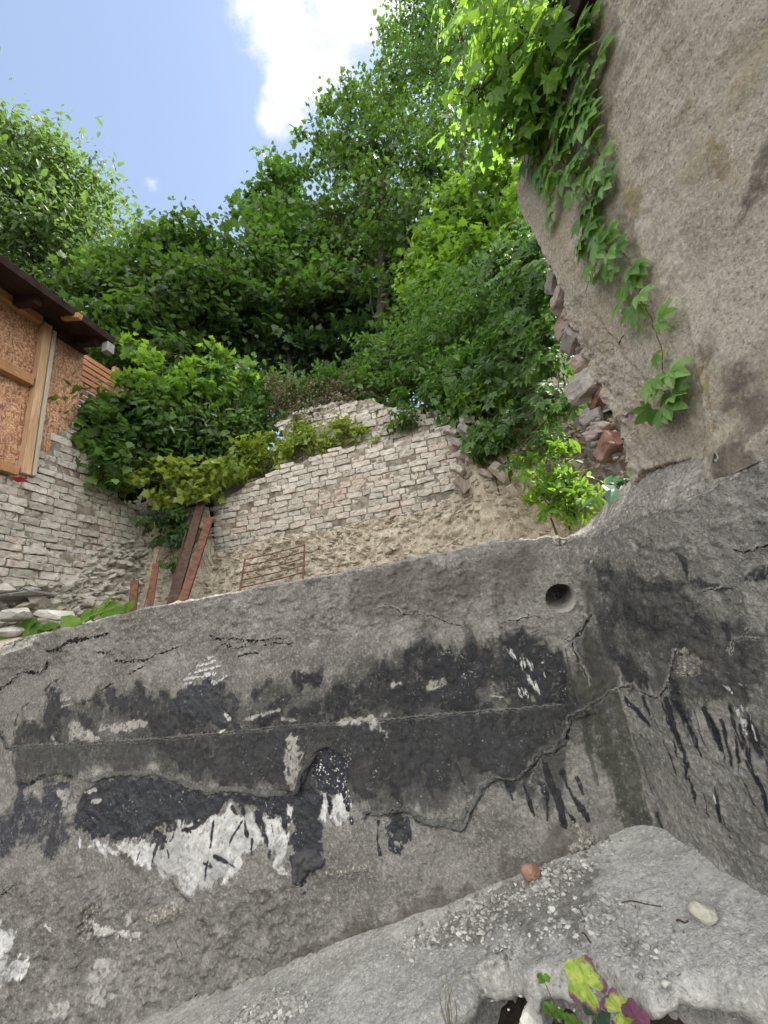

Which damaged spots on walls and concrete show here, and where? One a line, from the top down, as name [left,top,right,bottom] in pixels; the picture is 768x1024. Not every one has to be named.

peeling [182,656,227,686]
damp [259,670,322,727]
crack [0,611,682,832]
peeling [337,713,388,738]
peeling [426,678,447,691]
damp [554,626,768,838]
peeling [57,790,76,813]
peeling [69,709,316,943]
damp [108,805,289,881]
peeling [320,793,352,827]
damp [326,787,354,825]
damp [523,768,590,823]